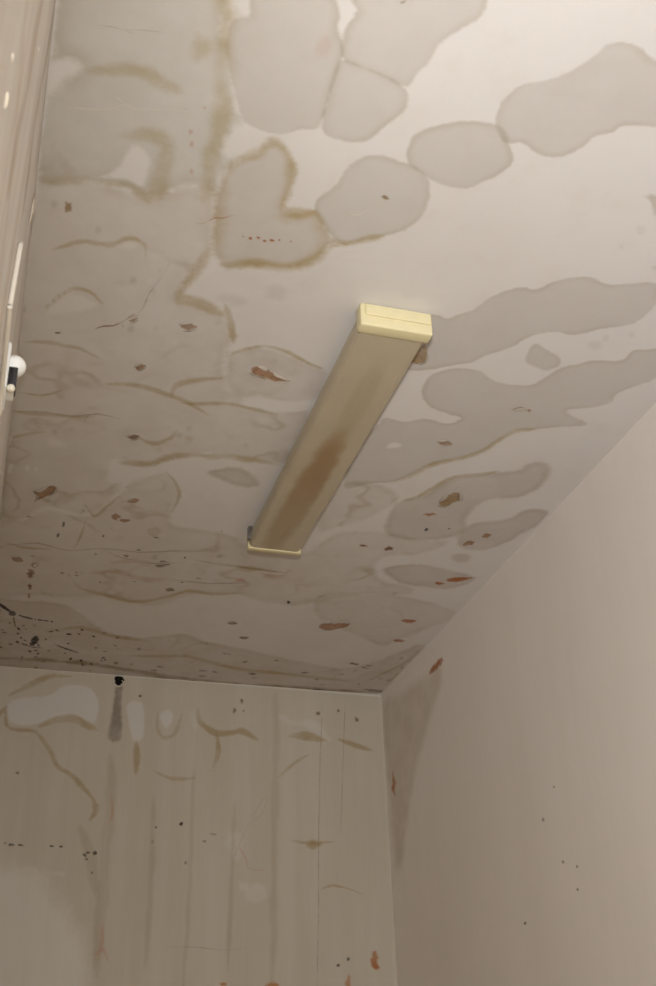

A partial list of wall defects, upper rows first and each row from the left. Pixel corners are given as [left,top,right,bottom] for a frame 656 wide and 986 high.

damp [0,0,656,512]
damp [0,274,656,986]
rust [428,653,445,679]
rust [367,947,384,974]